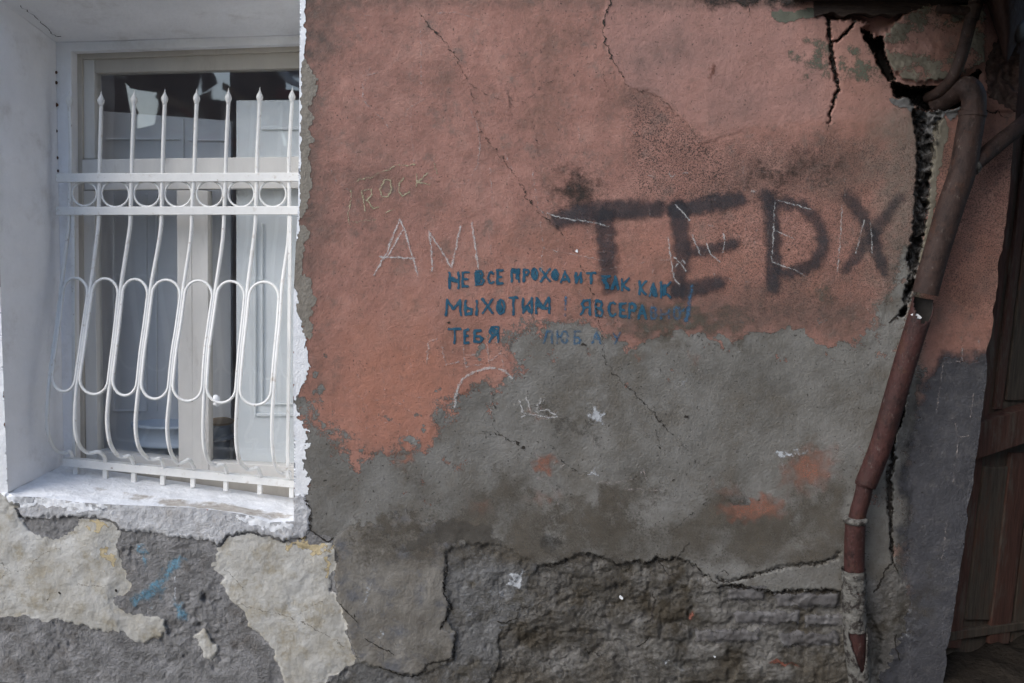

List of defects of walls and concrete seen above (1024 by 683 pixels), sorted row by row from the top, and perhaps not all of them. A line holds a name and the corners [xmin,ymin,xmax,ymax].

peeling [0,105,961,683]
crack [419,8,687,449]
crack [824,18,896,147]
crack [888,108,943,323]
peeling [865,351,987,683]